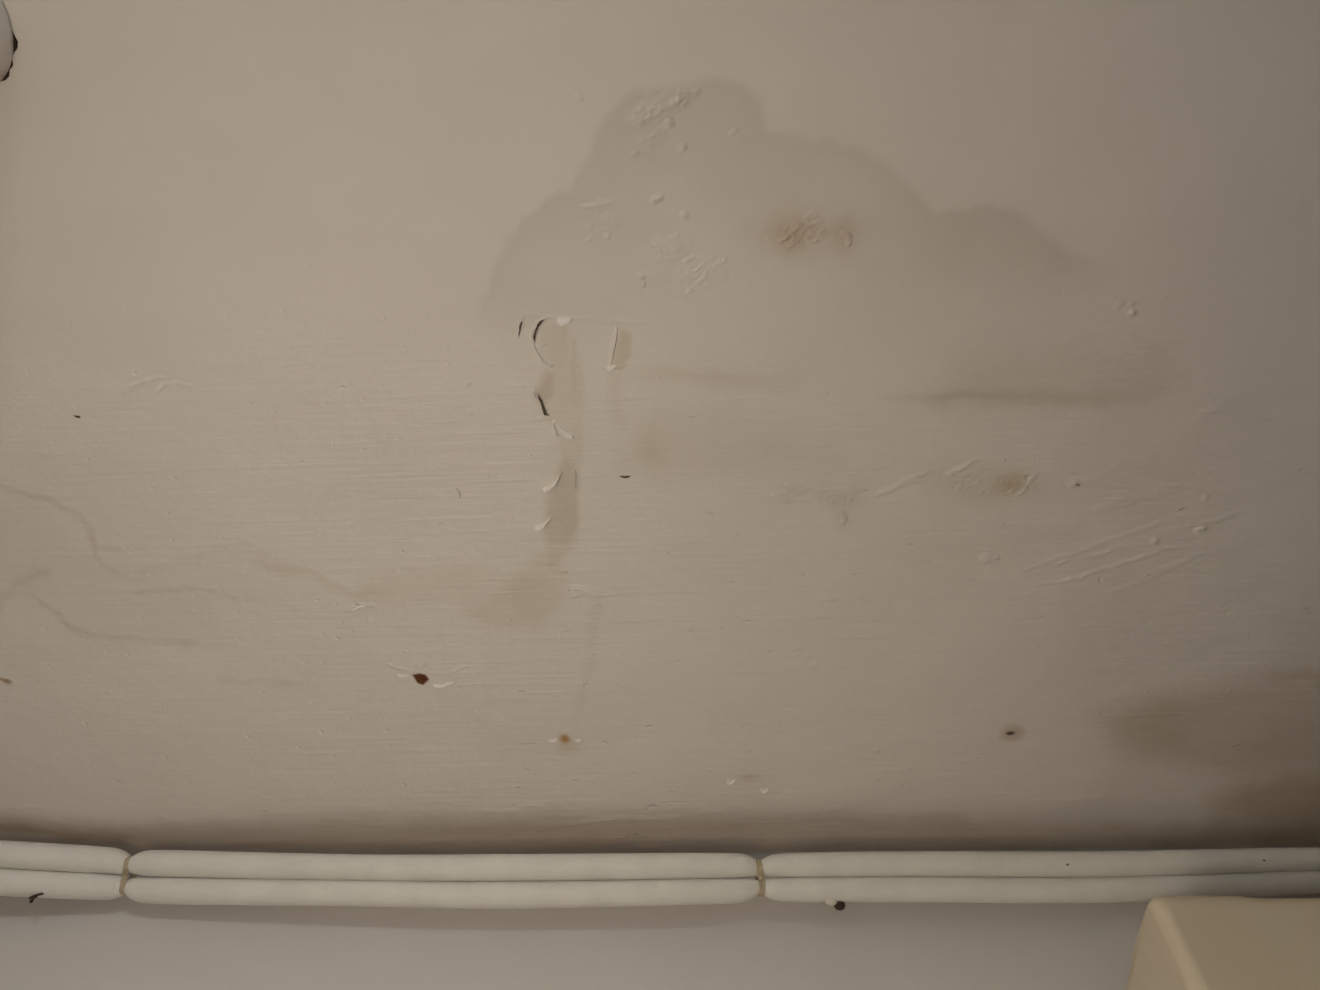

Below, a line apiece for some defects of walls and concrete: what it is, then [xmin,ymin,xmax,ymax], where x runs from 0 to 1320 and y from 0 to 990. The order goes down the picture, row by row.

water stain [472,72,1197,497]
peeling [508,311,647,558]
water stain [0,480,611,734]
rust [411,672,431,686]
rust [551,732,583,759]
water stain [0,653,1320,856]